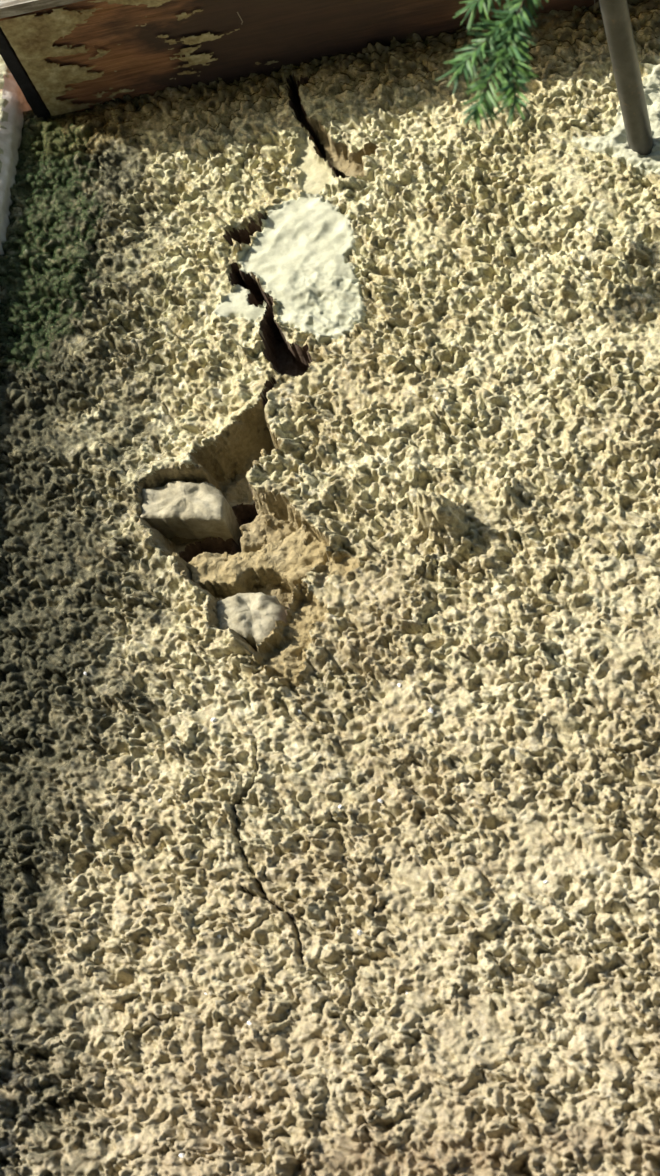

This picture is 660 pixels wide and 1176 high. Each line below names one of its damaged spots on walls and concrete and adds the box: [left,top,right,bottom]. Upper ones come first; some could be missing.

peeling [0,0,172,255]
peeling [156,29,239,79]
crack [285,67,379,195]
peeling [213,285,268,322]
crack [222,212,312,409]
water stain [0,95,169,1176]
spalling [135,398,361,691]